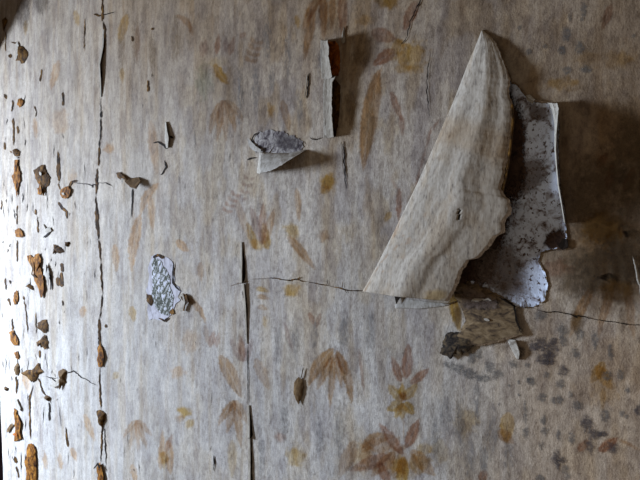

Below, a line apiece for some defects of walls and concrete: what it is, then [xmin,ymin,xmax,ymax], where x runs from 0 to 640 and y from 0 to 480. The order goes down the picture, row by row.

crack [0,0,114,345]
peeling [363,30,568,309]
peeling [146,254,188,322]
crack [231,277,363,293]
crack [538,310,639,325]
peeling [507,339,520,359]
leakage [519,329,566,365]
peeling [49,369,66,389]
crack [2,350,102,447]
crack [99,427,107,463]
leakage [581,417,606,453]